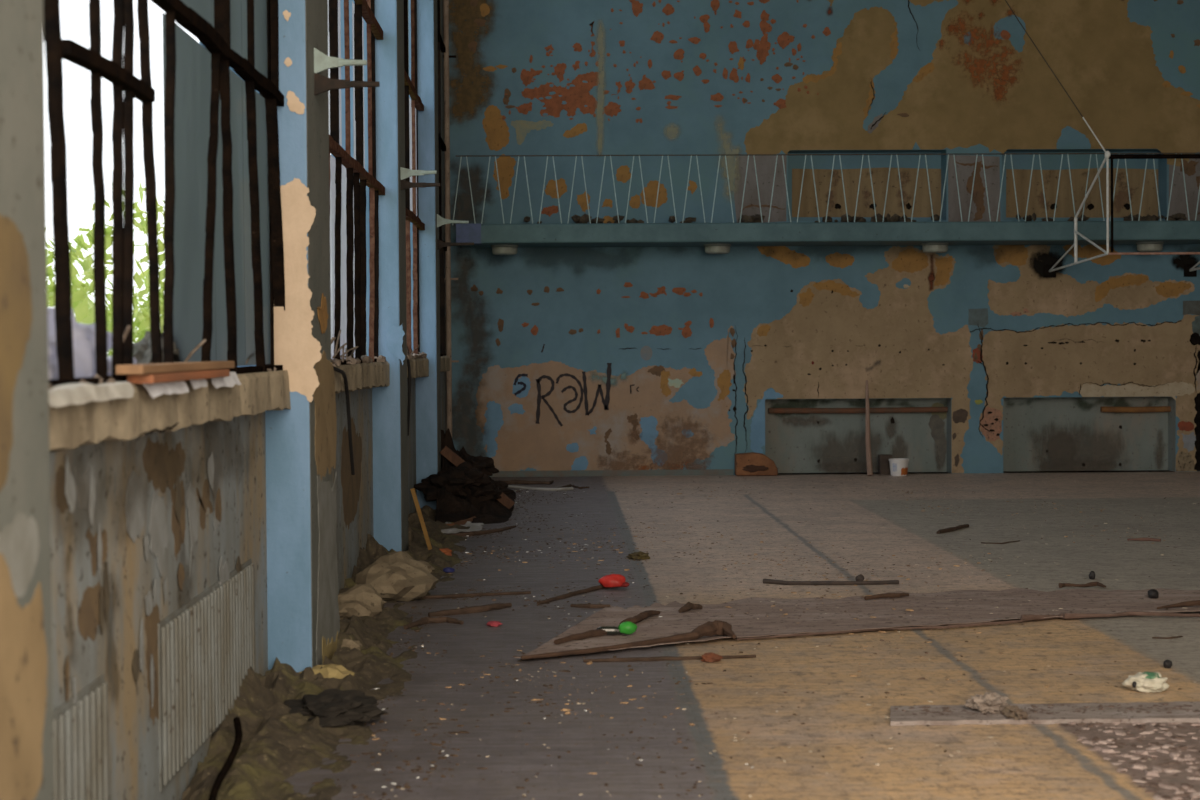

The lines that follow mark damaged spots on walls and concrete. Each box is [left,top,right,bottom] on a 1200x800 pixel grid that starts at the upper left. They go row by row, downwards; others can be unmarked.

peeling [286,91,305,114]
water stain [449,0,508,121]
peeling [482,0,1200,223]
corrosion [939,0,1020,100]
peeling [274,178,362,665]
peeling [475,245,1200,473]